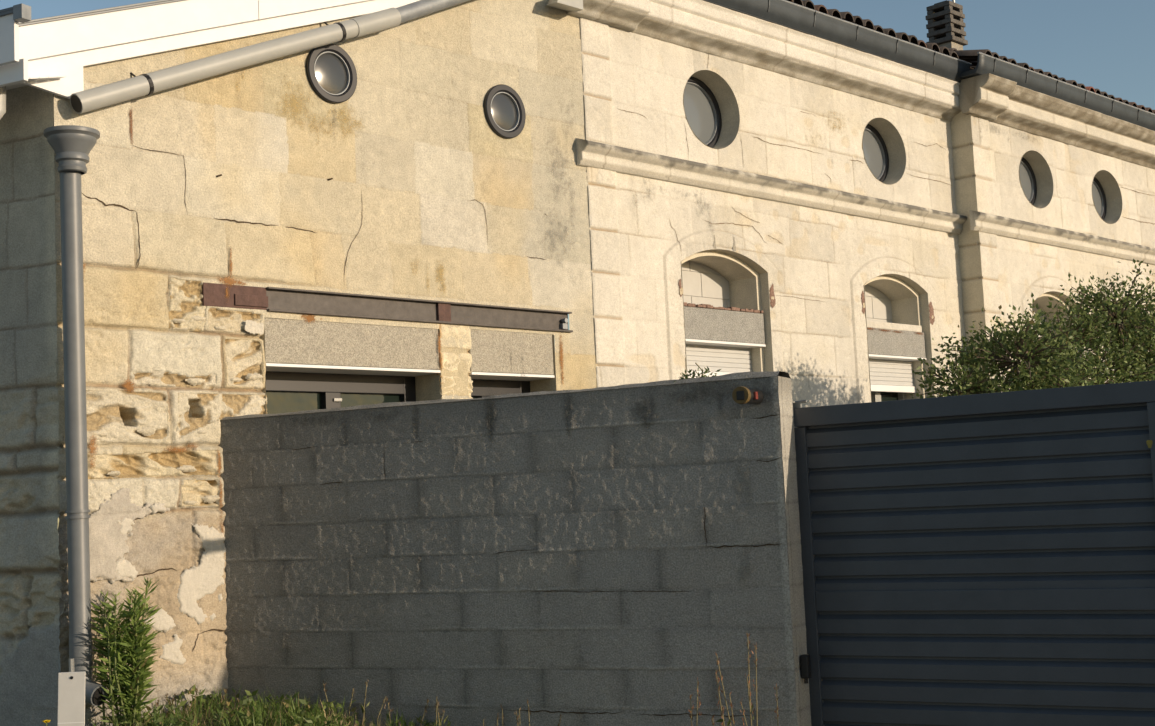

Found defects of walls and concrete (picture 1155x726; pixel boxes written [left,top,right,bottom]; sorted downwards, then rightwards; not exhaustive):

crack [82,193,141,268]
flaking render [144,523,226,665]